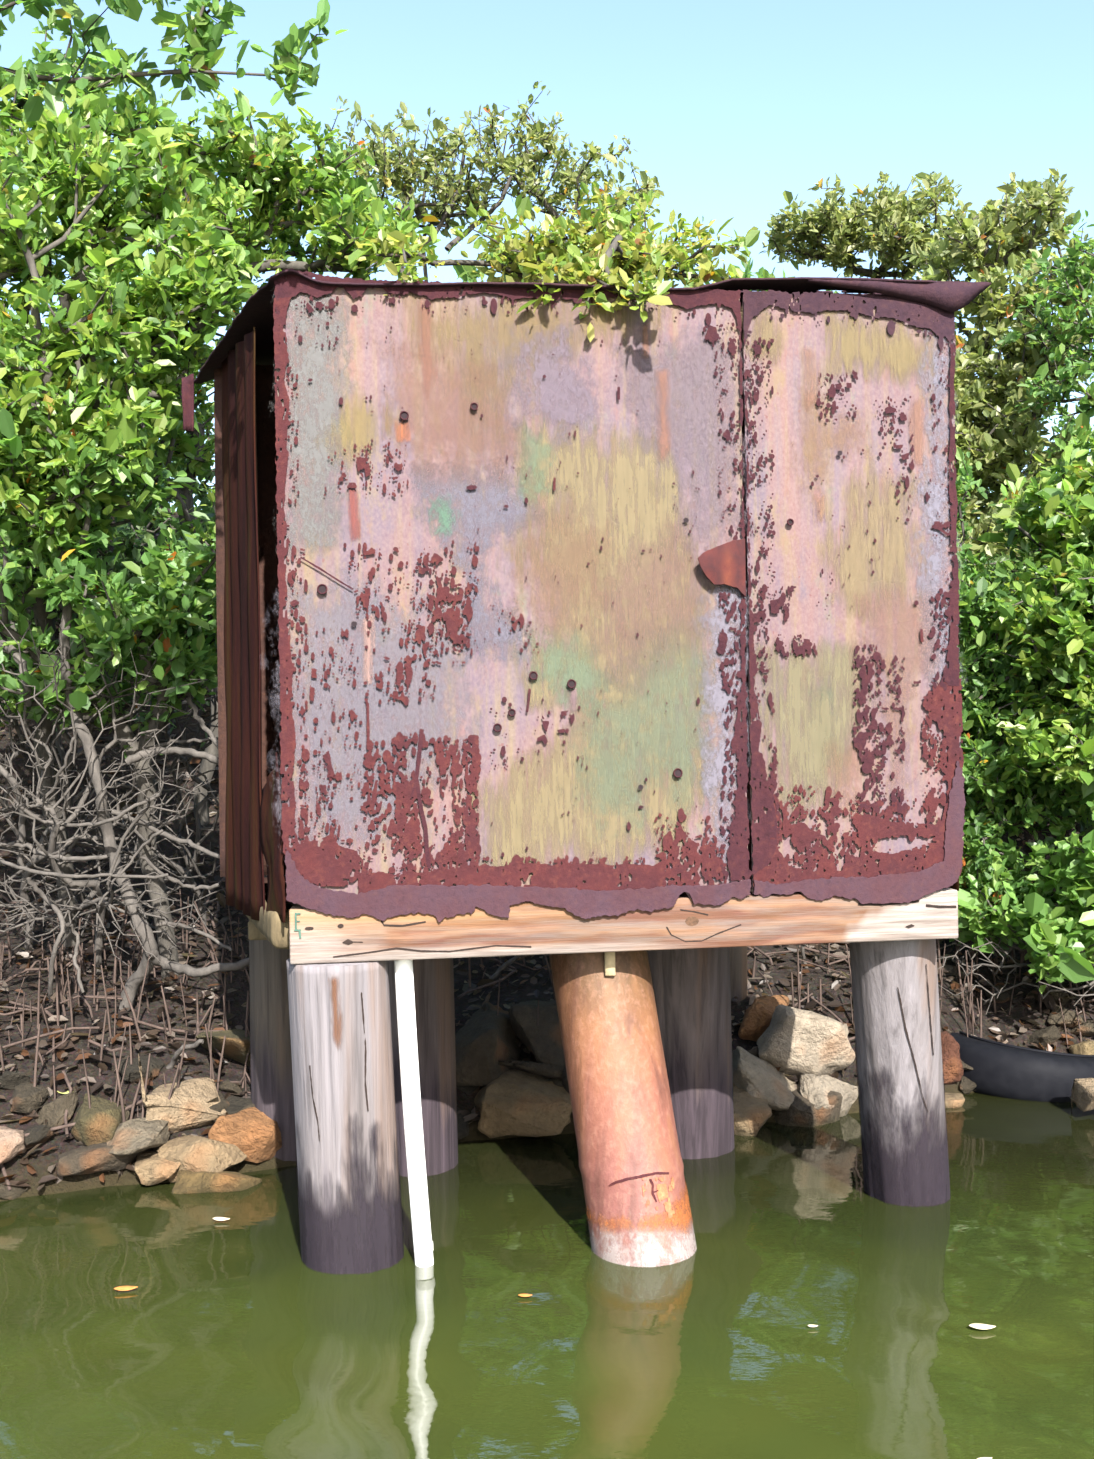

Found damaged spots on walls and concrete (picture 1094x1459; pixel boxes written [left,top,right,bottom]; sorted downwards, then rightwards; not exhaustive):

corrosion [358,840,667,894]
corrosion [273,268,960,881]
peeling [283,540,966,922]
corrosion [586,1182,693,1230]